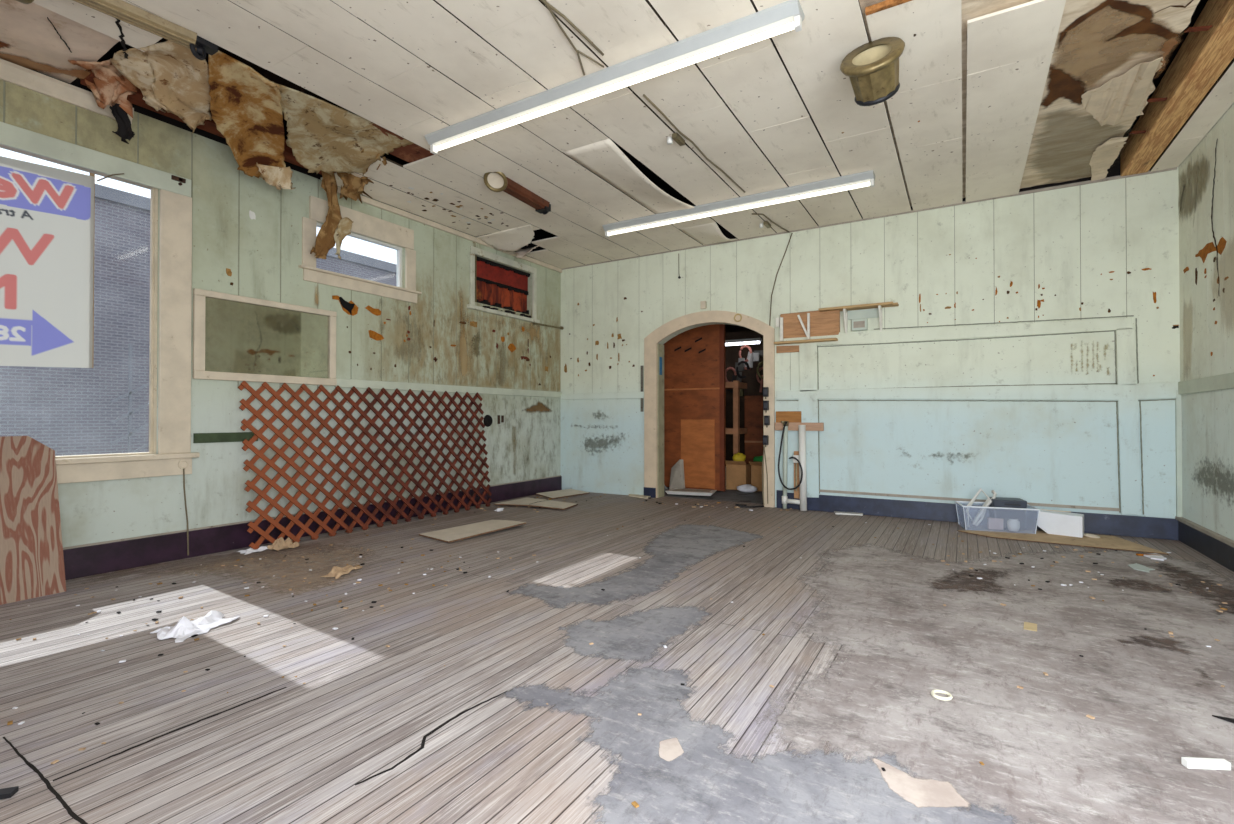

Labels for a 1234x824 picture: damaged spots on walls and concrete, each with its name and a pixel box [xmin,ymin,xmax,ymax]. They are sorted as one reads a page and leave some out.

water stain [1178,161,1208,214]
water stain [1194,461,1234,500]